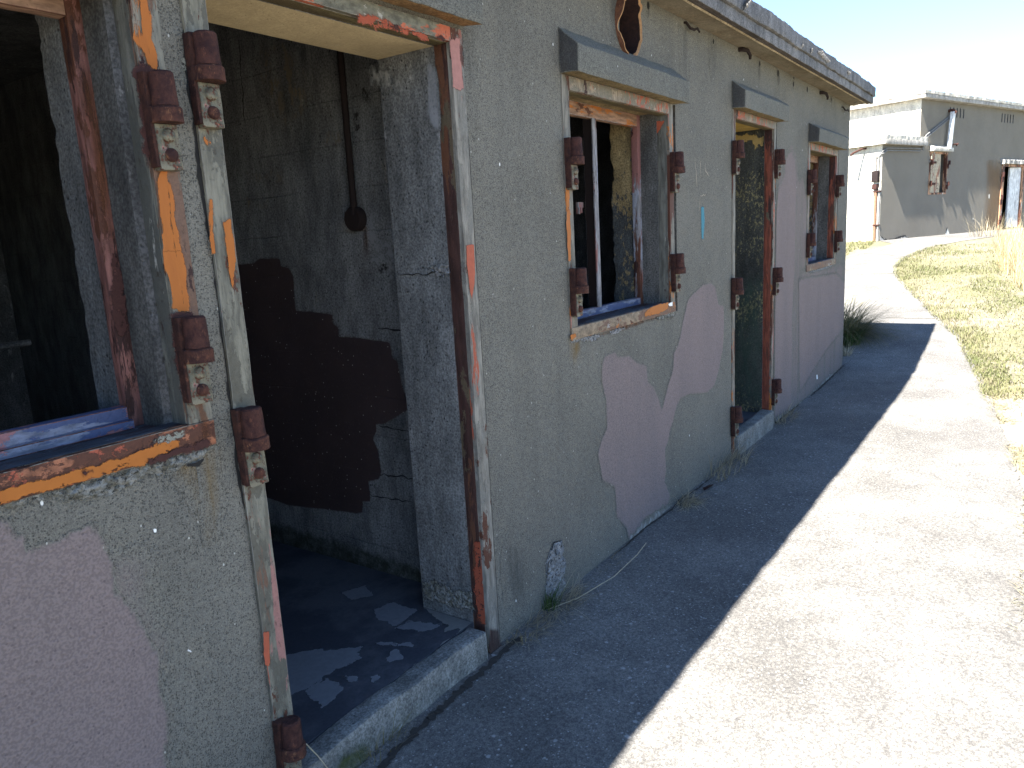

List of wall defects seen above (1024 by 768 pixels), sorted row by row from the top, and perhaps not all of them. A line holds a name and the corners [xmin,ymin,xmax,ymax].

peeling [133,0,158,69]
peeling [157,171,190,312]
peeling [208,199,236,287]
peeling [645,302,675,321]
peeling [0,430,220,509]
peeling [374,541,486,672]
spalling [545,540,566,599]
peeling [286,646,380,708]